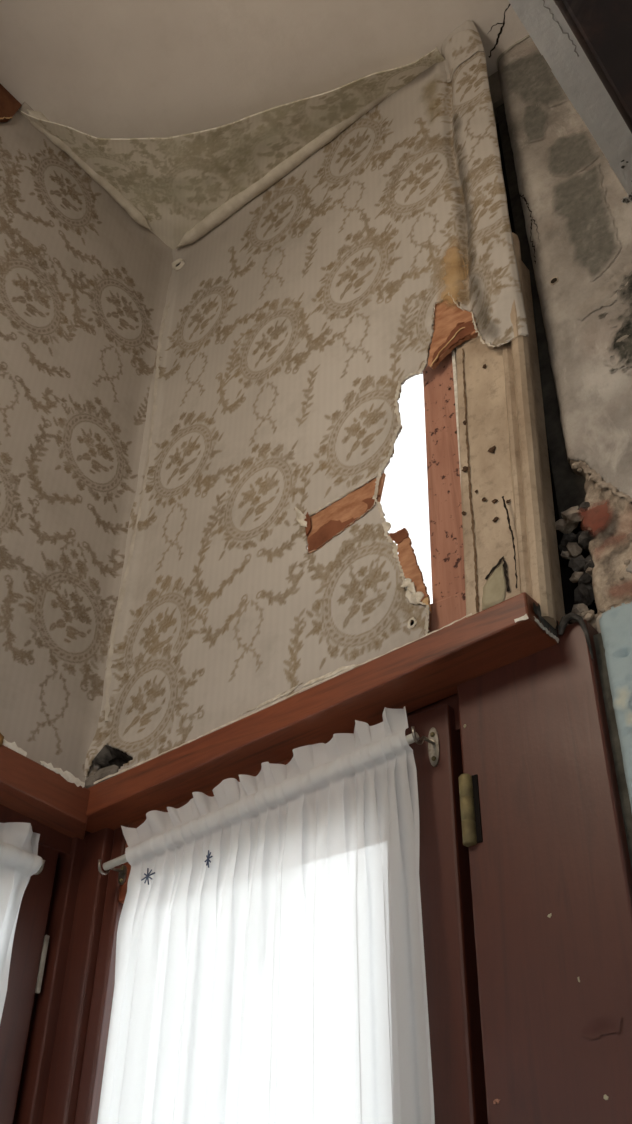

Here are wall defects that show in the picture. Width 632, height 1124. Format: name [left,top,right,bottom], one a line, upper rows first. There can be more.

crack [488,4,530,70]
crack [543,0,579,57]
mould [598,261,632,376]
peeling [448,349,511,613]
peeling [401,578,424,605]
spalling [514,460,632,644]